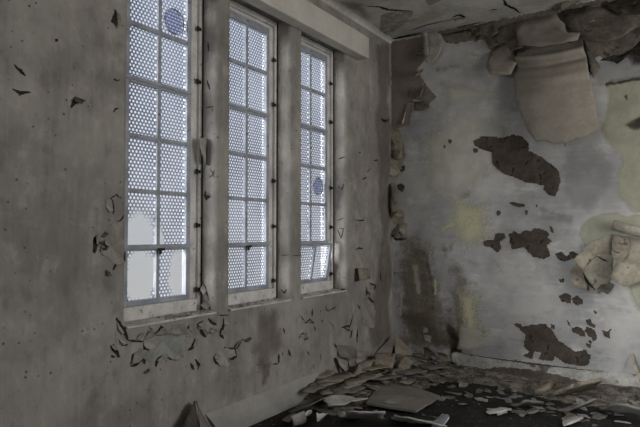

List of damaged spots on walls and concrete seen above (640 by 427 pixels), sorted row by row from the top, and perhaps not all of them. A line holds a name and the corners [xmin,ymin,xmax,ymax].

peeling [381,37,436,241]
spalling [474,134,561,196]
peeling [483,213,640,294]
water stain [404,241,450,347]
spalling [559,293,583,305]
peeling [110,315,230,374]
peeling [213,337,252,366]
spalling [514,310,612,366]